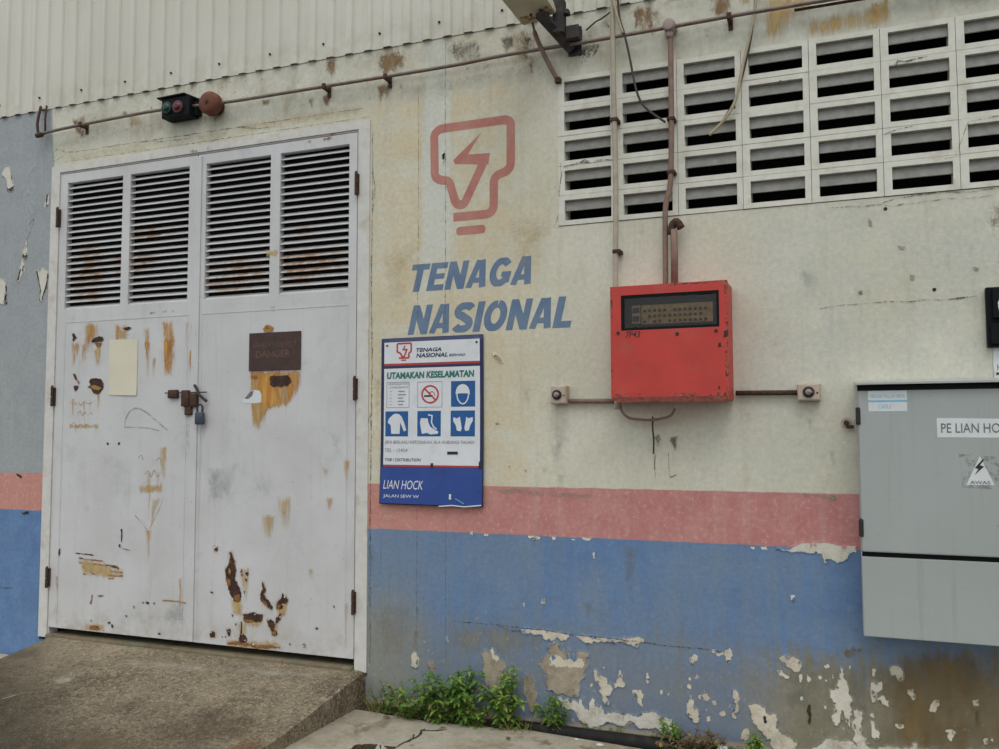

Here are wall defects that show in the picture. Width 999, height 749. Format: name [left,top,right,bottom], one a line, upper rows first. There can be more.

rust [768,0,804,35]
peeling [1,165,15,193]
peeling [0,239,49,306]
rust [72,325,104,361]
rust [164,323,173,373]
rust [73,374,103,396]
rust [250,371,299,425]
peeling [750,539,859,565]
rust [209,547,291,649]
peeling [480,647,508,692]
peeling [517,626,930,749]
damp [899,657,978,748]